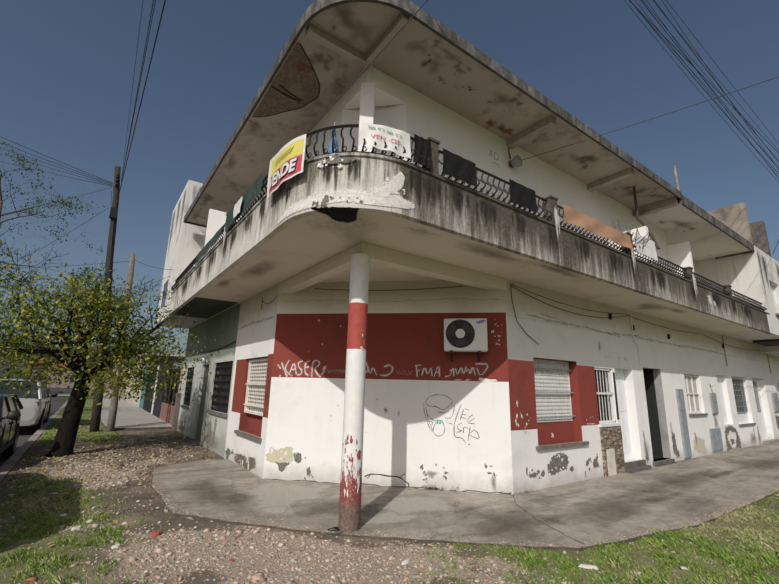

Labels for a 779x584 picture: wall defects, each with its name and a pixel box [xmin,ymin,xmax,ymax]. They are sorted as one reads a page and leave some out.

damp [245,187,291,228]
damp [312,163,338,187]
spalling [317,154,356,168]
spalling [311,195,363,223]
damp [348,160,361,178]
peeling [371,171,412,206]
damp [452,188,496,220]
damp [548,208,560,248]
damp [690,274,720,307]
peeling [225,447,313,480]
peeling [344,436,361,498]
peeling [526,452,574,479]